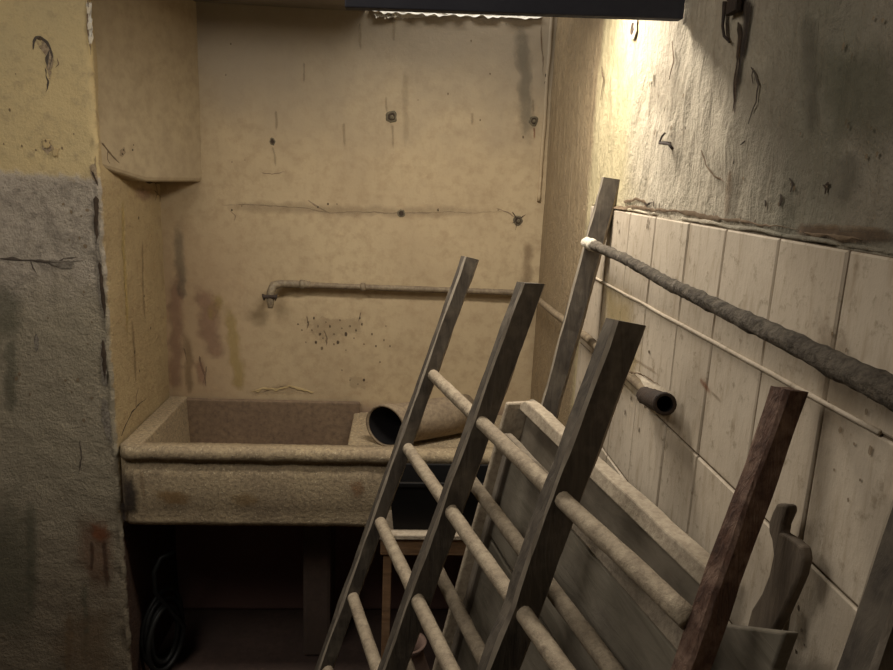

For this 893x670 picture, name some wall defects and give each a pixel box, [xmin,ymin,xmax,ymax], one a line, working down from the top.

crack [32,36,59,91]
crack [725,22,759,164]
crack [230,200,521,225]
crack [0,257,82,272]